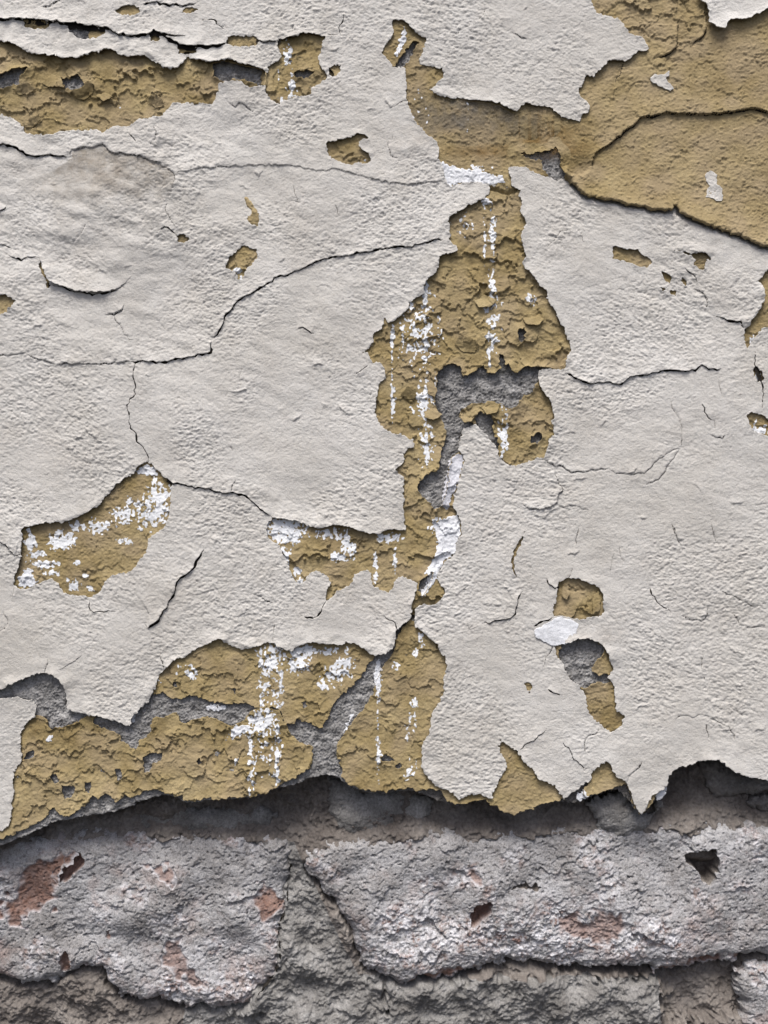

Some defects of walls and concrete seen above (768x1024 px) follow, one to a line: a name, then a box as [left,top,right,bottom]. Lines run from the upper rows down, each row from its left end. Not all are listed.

peeling [0,33,341,136]
crack [0,126,436,236]
crack [592,107,767,166]
crack [0,239,441,459]
peeling [266,0,768,620]
crack [568,365,725,439]
peeling [13,462,172,597]
crack [166,479,268,515]
crack [149,550,204,628]
peeling [0,619,565,845]
peeling [555,638,625,732]
peeling [576,762,667,815]